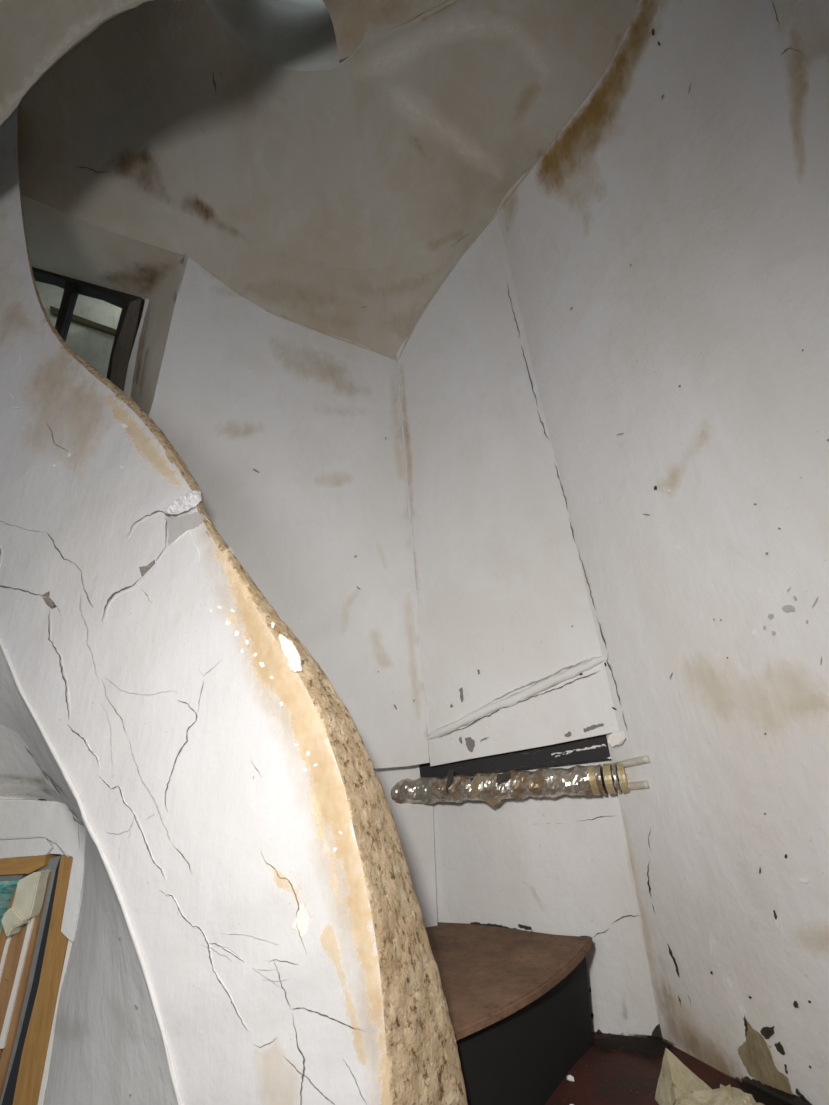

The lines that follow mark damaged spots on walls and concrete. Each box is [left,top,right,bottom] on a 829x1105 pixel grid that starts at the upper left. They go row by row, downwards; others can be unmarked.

water stain [540,0,657,190]
crack [126,510,162,539]
flaking render [139,559,155,577]
peeling [106,394,211,561]
crack [507,284,627,748]
water stain [237,612,295,732]
crack [0,521,363,1105]
peeling [209,542,394,1105]
water stain [310,763,357,923]
flaking render [737,1016,812,1105]